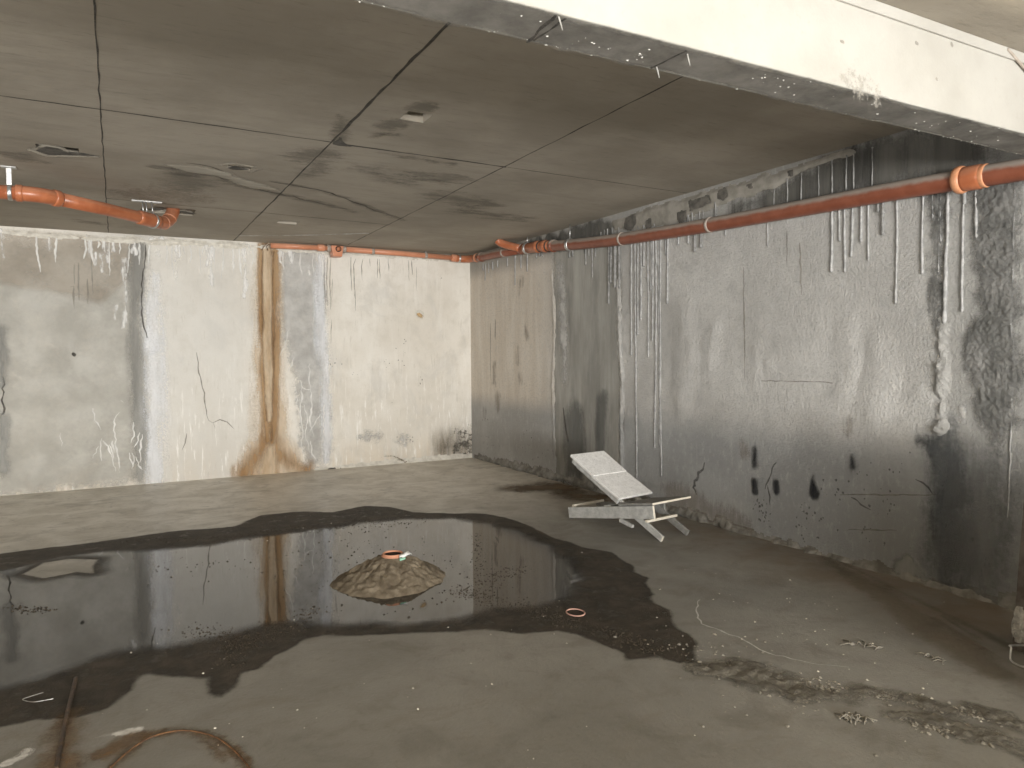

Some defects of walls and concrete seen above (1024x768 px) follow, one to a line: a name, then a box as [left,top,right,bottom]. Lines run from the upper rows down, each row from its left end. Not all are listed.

crack [168,163,397,217]
flaking render [612,149,856,231]
crack [140,245,148,338]
water stain [0,228,309,495]
crack [196,352,234,429]
rust [232,243,312,476]
crack [692,462,705,495]
water stain [809,478,819,499]
water stain [918,430,1010,599]
water stain [0,506,697,727]